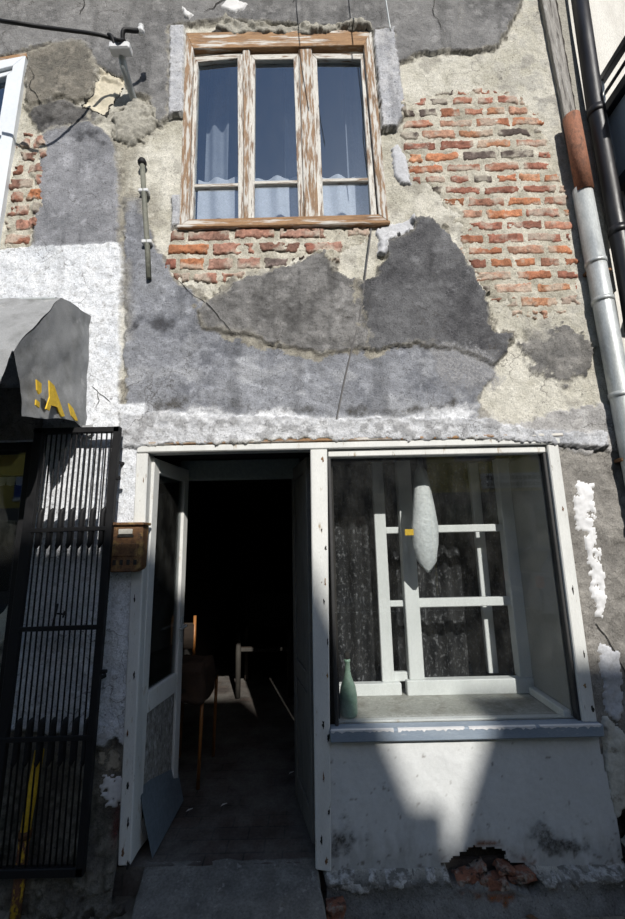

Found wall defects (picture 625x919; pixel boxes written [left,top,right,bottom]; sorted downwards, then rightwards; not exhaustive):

flaking render [5,132,47,248]
flaking render [391,88,581,320]
flaking render [164,213,416,286]
peeling [98,747,129,808]
damp [534,824,580,856]